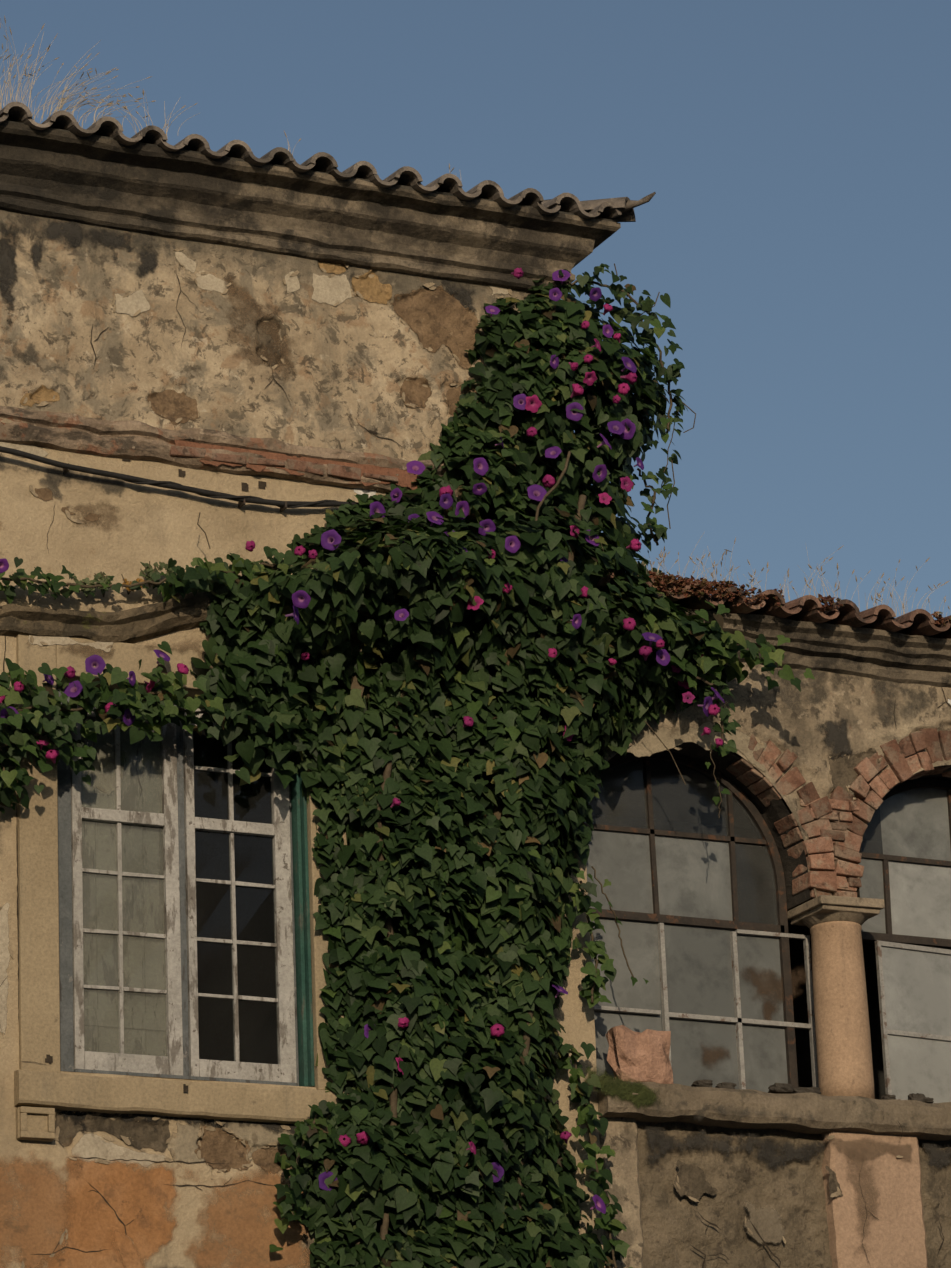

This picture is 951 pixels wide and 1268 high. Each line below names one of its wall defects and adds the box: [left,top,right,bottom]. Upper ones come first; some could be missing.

damp [0,215,158,324]
flaking render [255,313,290,369]
flaking render [283,261,481,369]
flaking render [147,389,200,425]
flaking render [400,377,486,415]
peeling [0,903,13,1034]
crack [31,1157,274,1255]
peeling [0,1111,310,1268]
flaking render [744,1201,786,1244]